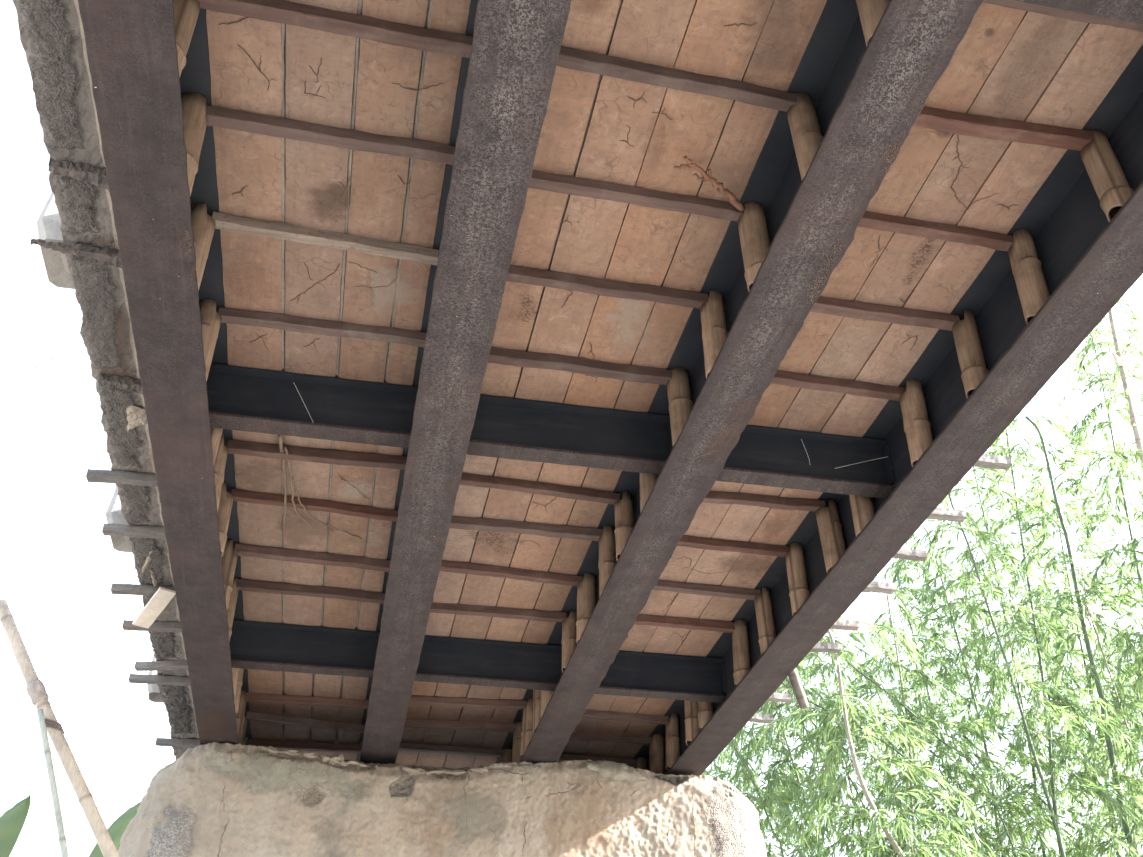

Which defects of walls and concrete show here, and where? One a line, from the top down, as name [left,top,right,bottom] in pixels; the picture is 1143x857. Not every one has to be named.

crack [218,17,277,91]
crack [304,58,325,98]
crack [392,83,444,91]
crack [619,92,673,146]
crack [951,135,1019,210]
crack [290,262,394,302]